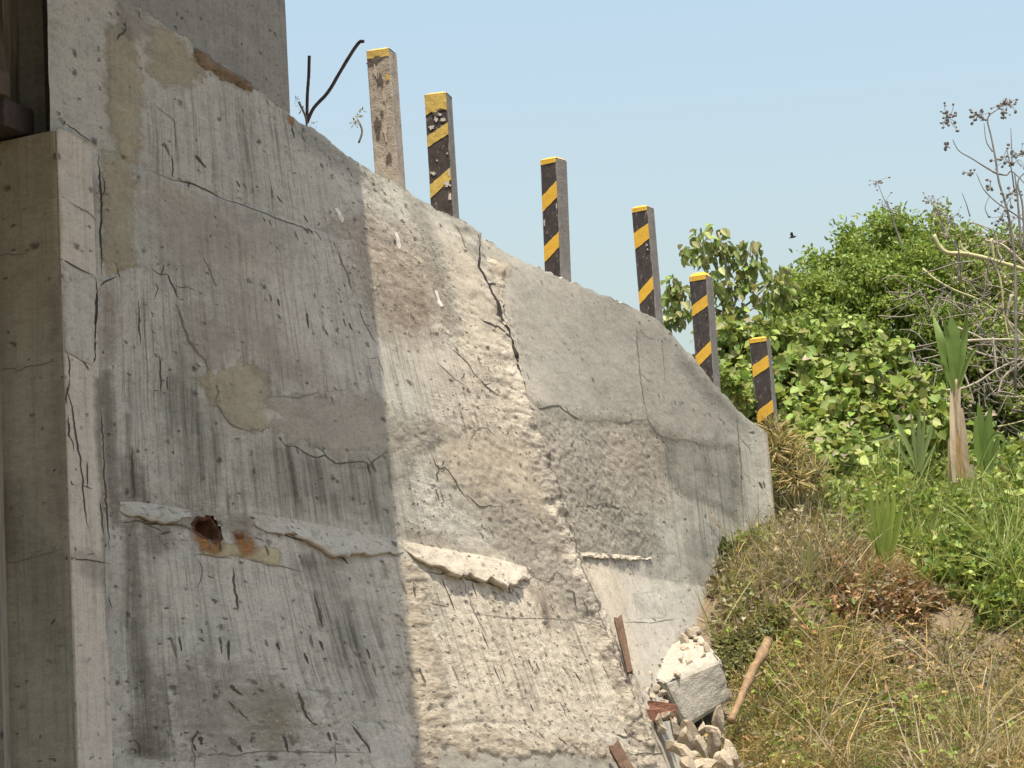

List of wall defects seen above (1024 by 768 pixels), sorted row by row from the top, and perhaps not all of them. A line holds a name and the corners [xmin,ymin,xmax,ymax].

crack [0,121,191,563]
corrosion [234,529,254,555]
crack [143,105,385,377]
crack [138,257,395,471]
spalling [395,415,661,768]
crack [417,224,751,755]